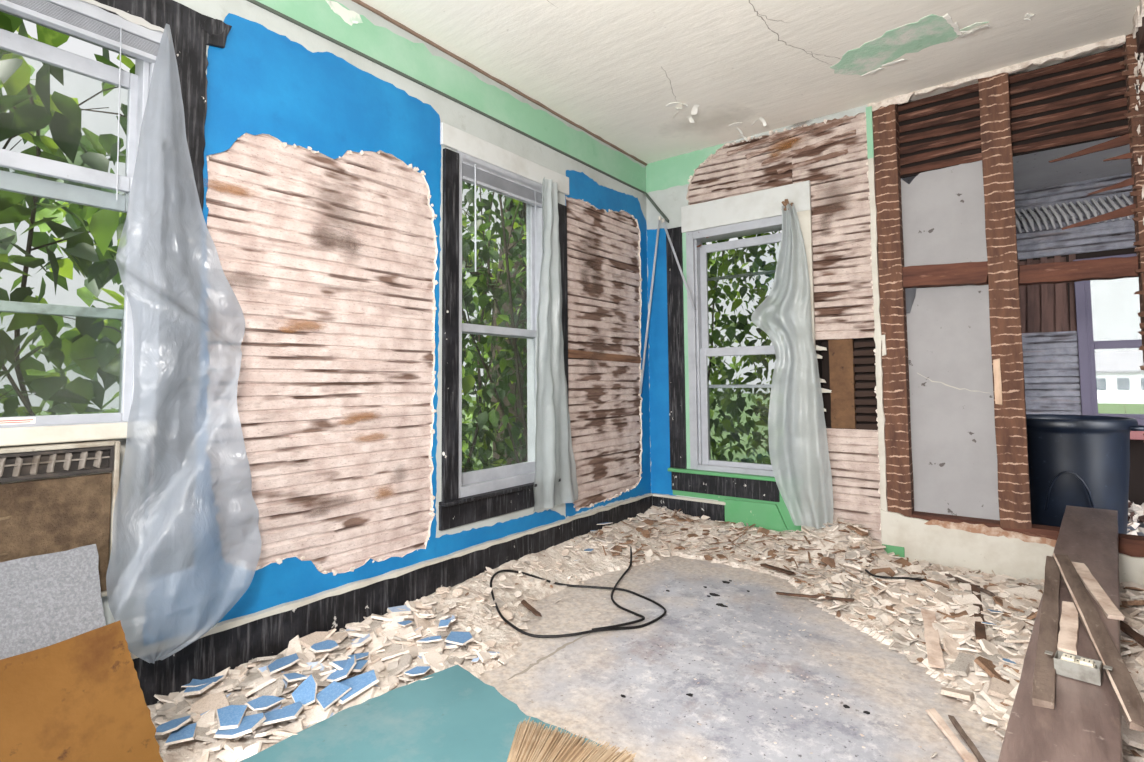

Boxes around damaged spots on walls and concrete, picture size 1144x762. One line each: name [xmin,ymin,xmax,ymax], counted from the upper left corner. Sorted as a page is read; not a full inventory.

peeling [325,0,363,26]
crack [749,0,840,65]
peeling [830,13,990,77]
flaking render [687,112,876,365]
flaking render [206,134,438,576]
flaking render [566,197,643,511]
flaking render [826,386,882,545]